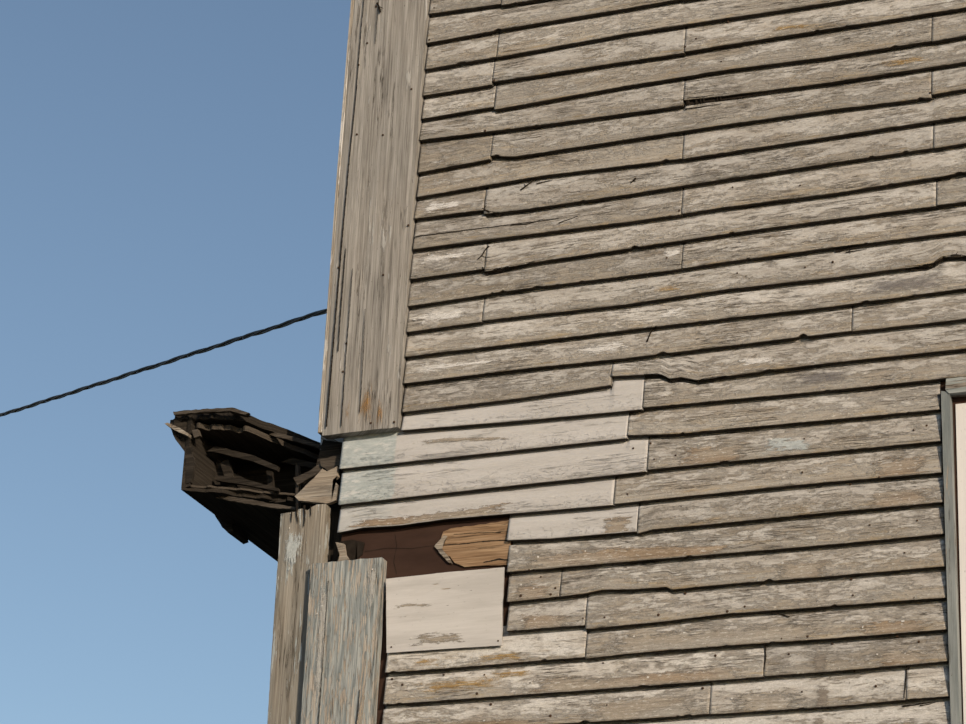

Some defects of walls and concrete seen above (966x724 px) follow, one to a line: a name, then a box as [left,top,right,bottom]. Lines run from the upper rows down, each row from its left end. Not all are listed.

peeling [347,502,510,528]